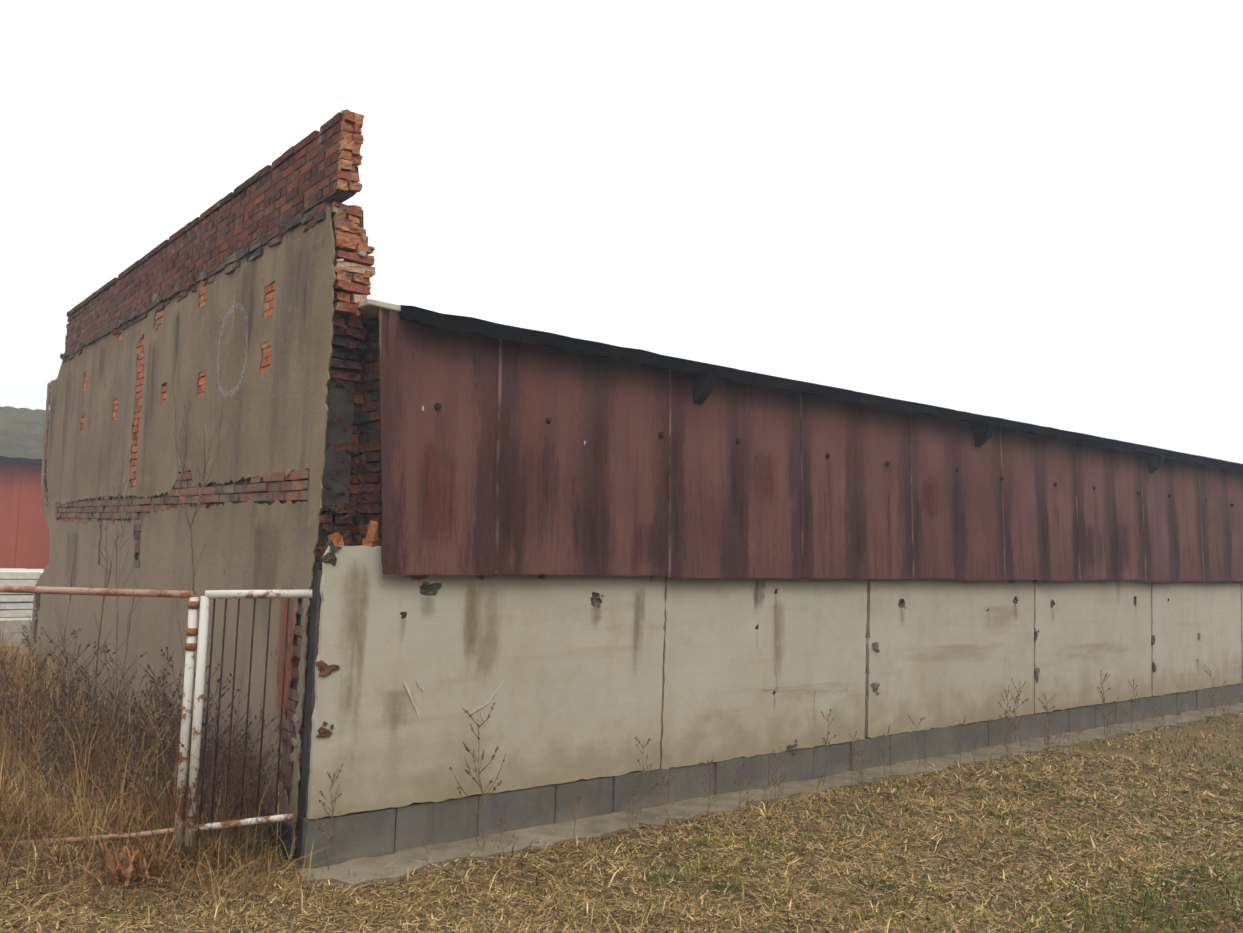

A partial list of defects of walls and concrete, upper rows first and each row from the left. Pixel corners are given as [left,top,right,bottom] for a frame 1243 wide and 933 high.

flaking render [263,282,275,316]
spalling [320,532,344,566]
spalling [362,520,381,548]